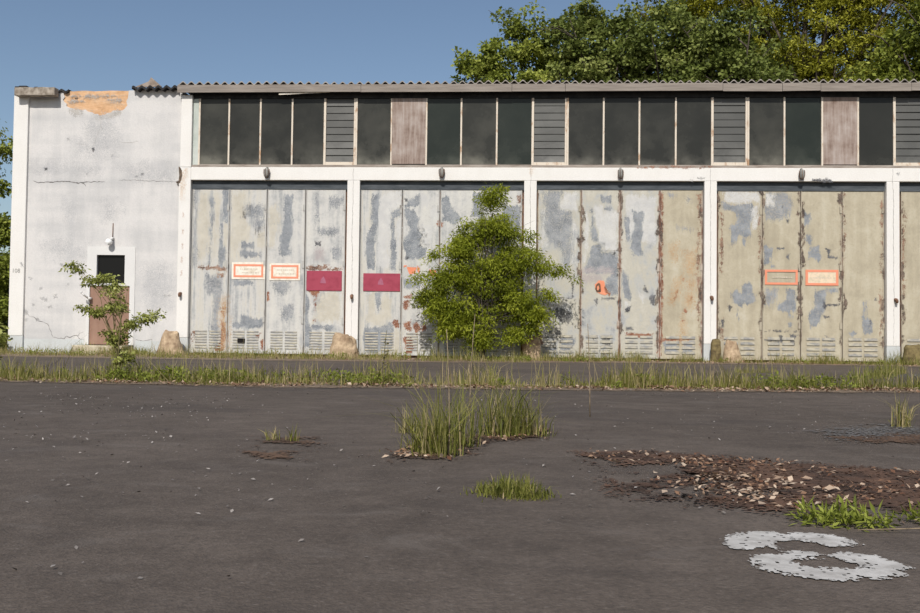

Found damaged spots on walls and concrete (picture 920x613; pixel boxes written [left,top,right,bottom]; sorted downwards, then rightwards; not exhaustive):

spalling [64,91,129,121]
crack [34,179,104,187]
peeling [191,189,294,344]
peeling [313,192,345,262]
peeling [364,190,482,289]
peeling [537,190,703,356]
corrosion [626,192,703,357]
peeling [717,191,848,344]
peeling [269,280,343,348]
corrosion [392,293,427,358]
peeling [826,297,885,347]